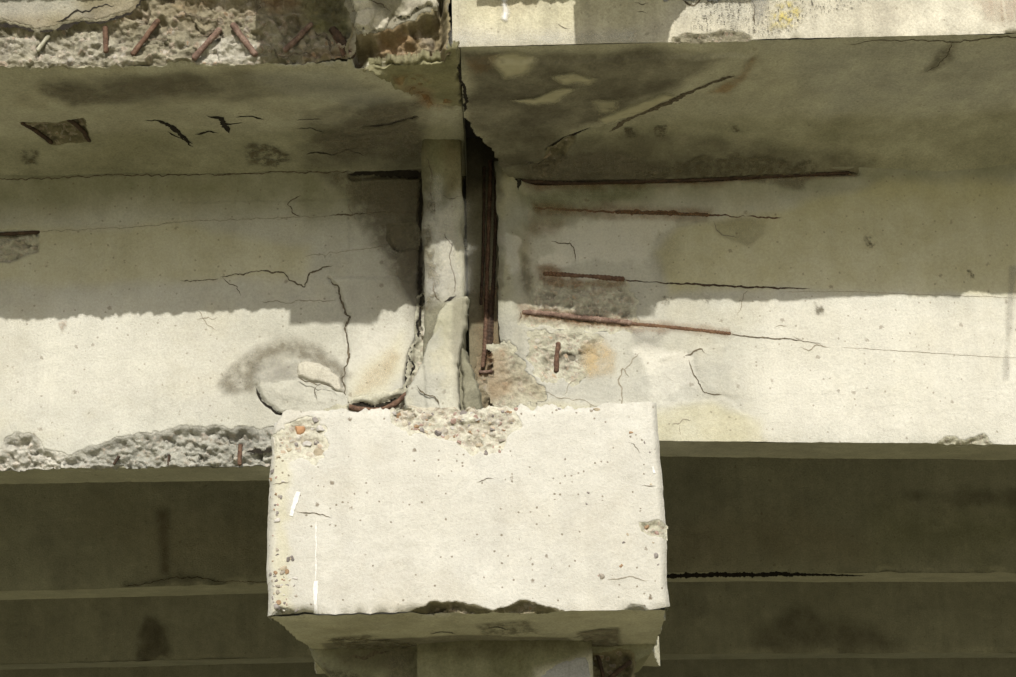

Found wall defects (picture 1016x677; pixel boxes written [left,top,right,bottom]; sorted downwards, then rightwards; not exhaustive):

spalling [0,0,463,106]
spalling [20,118,92,145]
crack [552,76,734,148]
crack [0,115,460,403]
spalling [0,159,856,482]
crack [256,388,282,415]
crack [685,348,721,395]
spalling [269,548,314,615]
spalling [639,520,668,566]
crack [608,571,863,581]